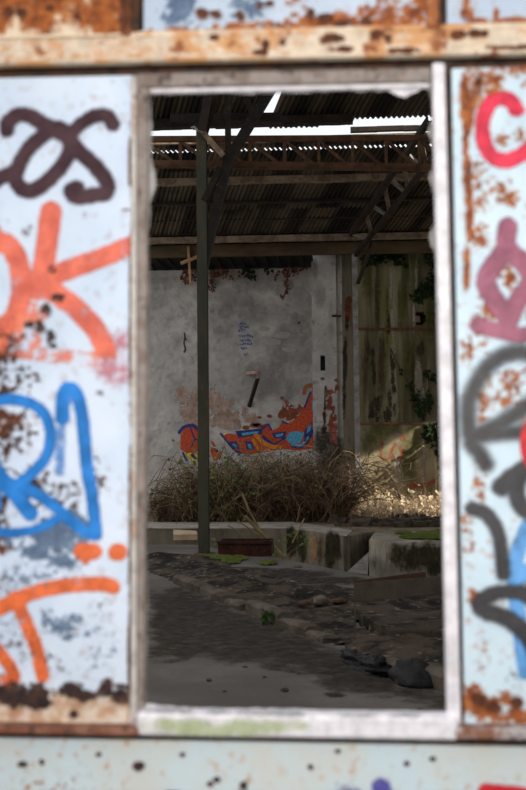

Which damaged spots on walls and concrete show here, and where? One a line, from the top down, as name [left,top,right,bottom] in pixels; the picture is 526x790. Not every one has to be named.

corrosion [0,0,288,61]
corrosion [147,0,426,55]
corrosion [459,66,526,292]
water stain [363,254,424,422]
corrosion [458,332,487,365]
corrosion [0,407,21,444]
flaking render [174,386,198,426]
flaking render [209,388,304,430]
water stain [389,540,443,577]
corrosion [0,445,131,723]
corrosion [463,682,526,724]